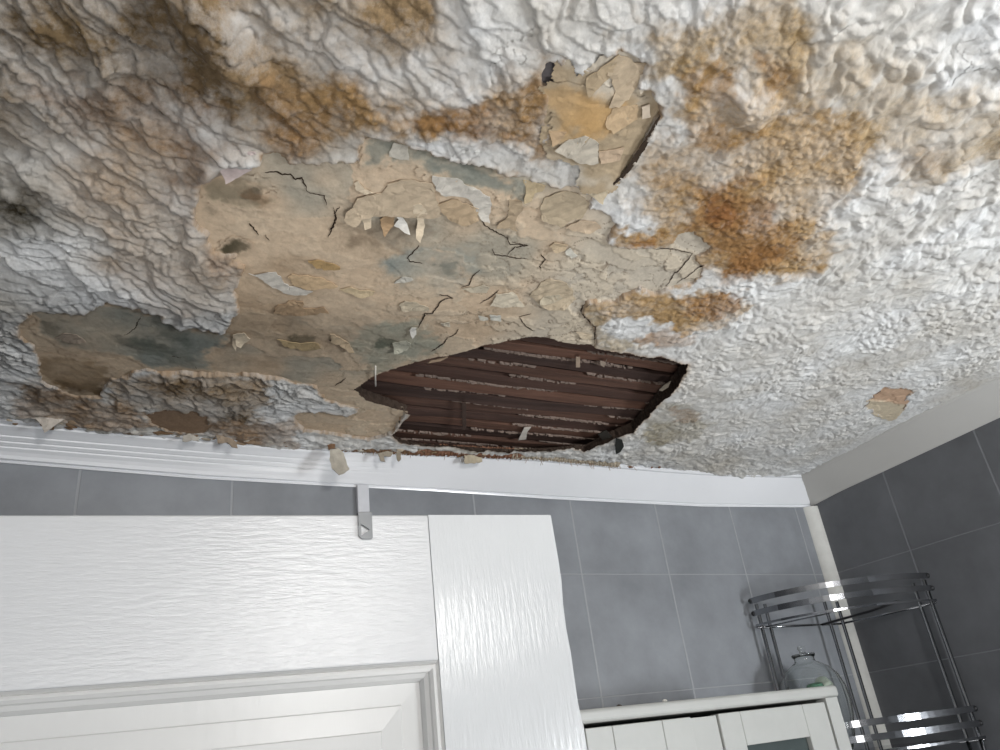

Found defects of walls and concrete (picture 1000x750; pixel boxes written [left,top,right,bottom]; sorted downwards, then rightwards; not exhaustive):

crack [265,171,340,236]
peeling [178,49,710,437]
crack [418,221,546,328]
damp [0,0,1000,450]
crack [656,248,704,286]
peeling [866,387,912,421]